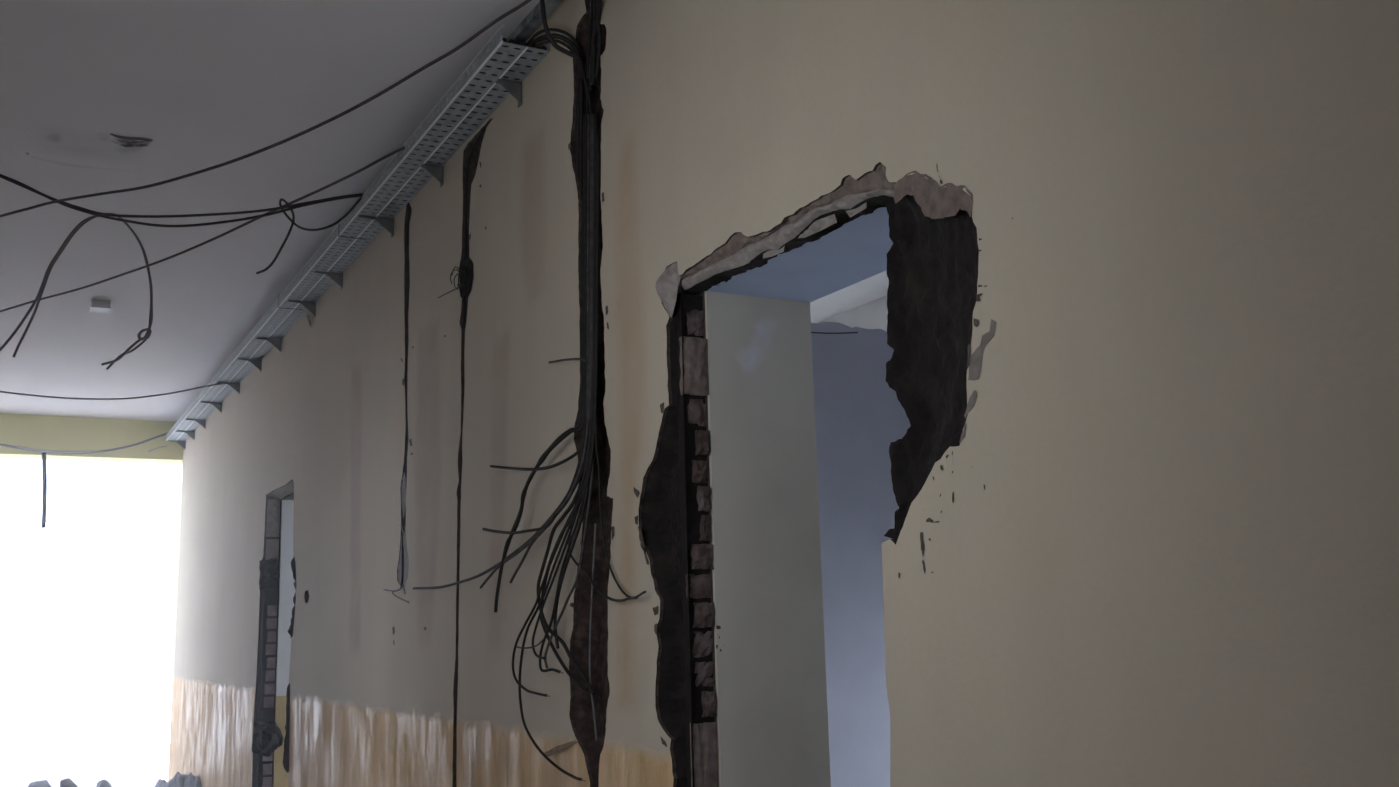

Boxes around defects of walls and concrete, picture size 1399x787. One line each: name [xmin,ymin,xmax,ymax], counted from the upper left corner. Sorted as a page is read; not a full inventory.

flaking render [252,481,309,787]
flaking render [634,164,996,787]